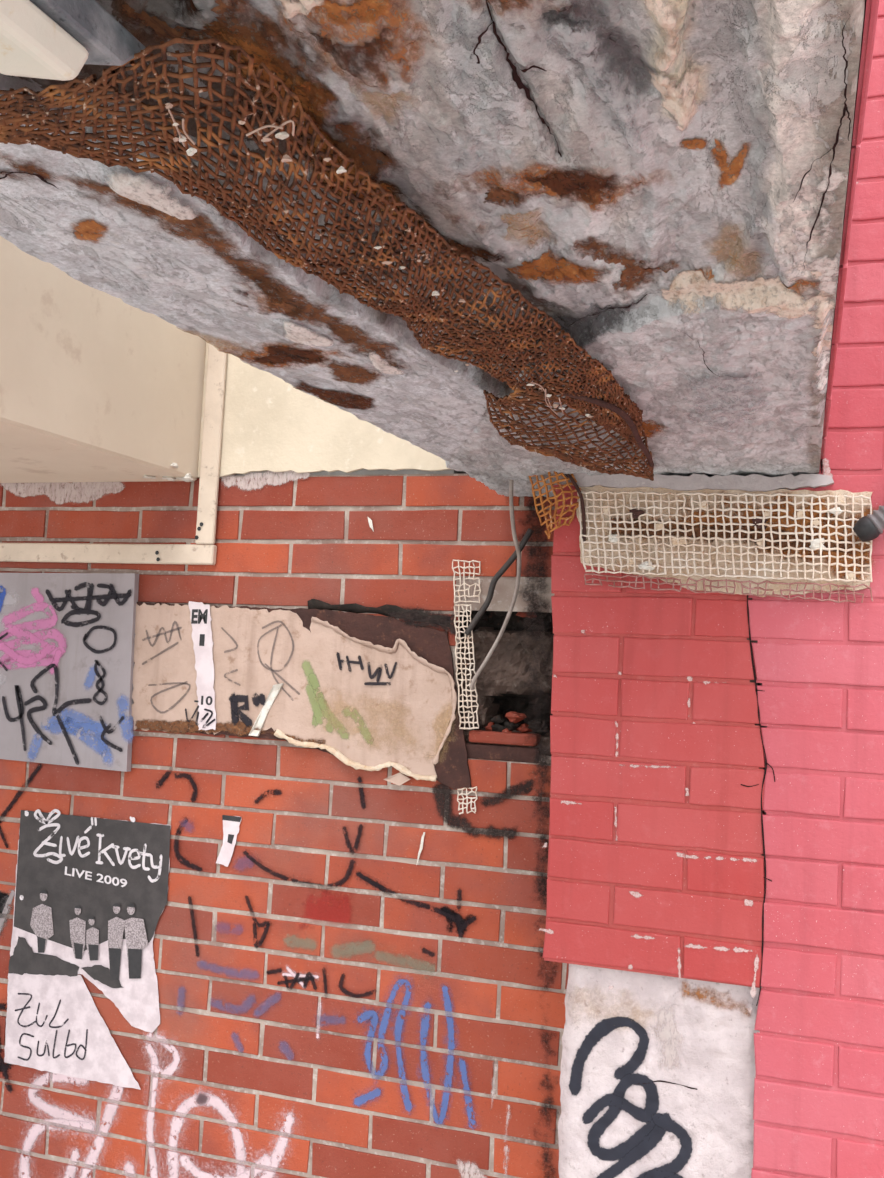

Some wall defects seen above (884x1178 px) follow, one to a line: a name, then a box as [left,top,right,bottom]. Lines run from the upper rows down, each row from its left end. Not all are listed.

flaking render [108,173,197,220]
crack [473,0,562,157]
crack [564,17,634,129]
spalling [645,0,699,131]
rust [681,139,749,188]
crack [793,14,851,269]
flaking render [284,321,333,347]
spalling [295,380,374,410]
rust [0,0,678,539]
rust [784,280,817,295]
peeling [131,599,557,786]
crack [741,595,775,1006]